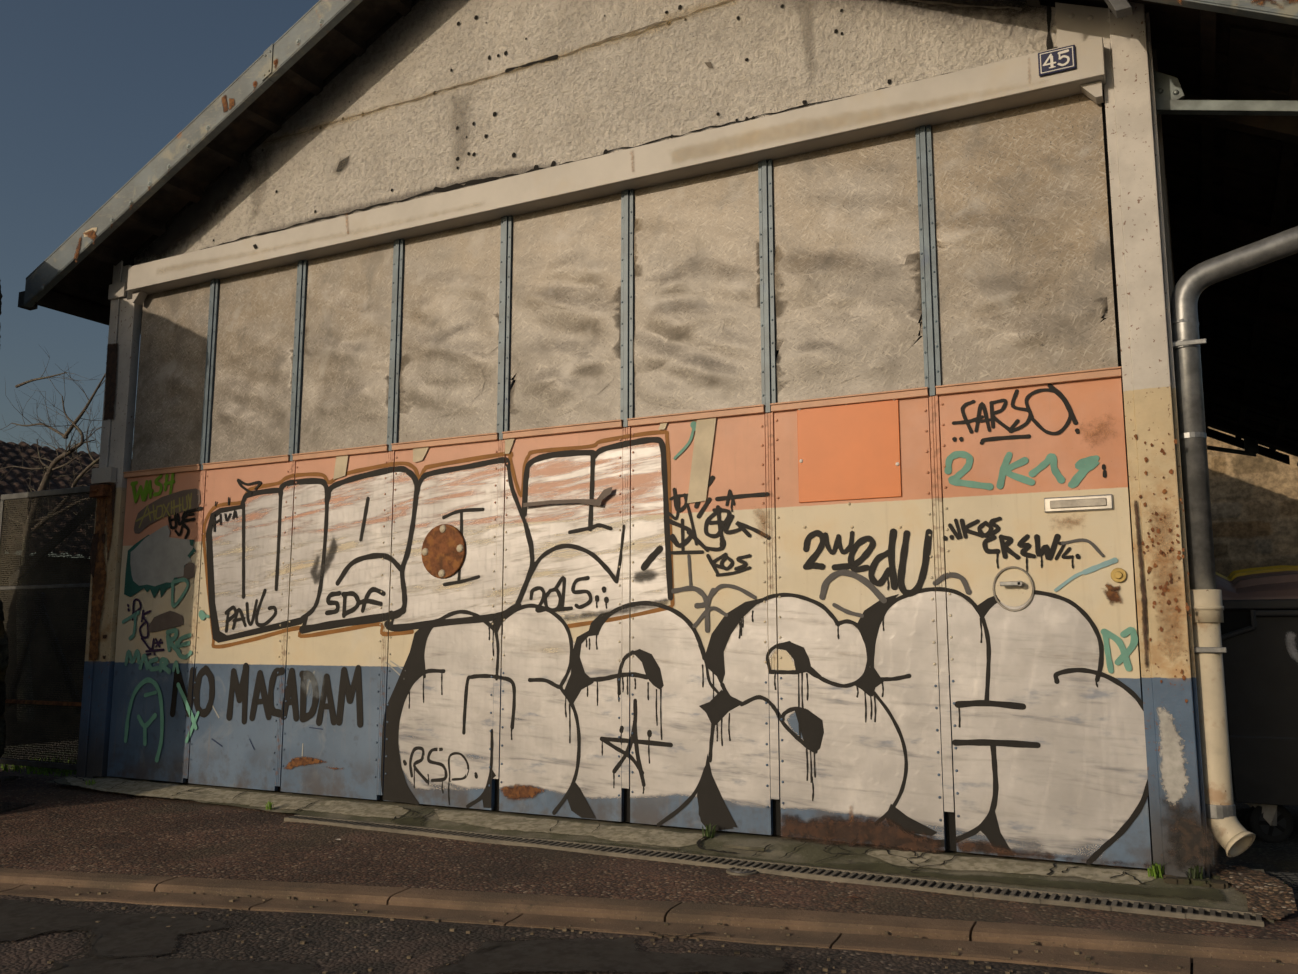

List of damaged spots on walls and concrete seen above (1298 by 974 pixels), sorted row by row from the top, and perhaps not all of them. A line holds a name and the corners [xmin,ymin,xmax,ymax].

crack [264,0,732,143]
crack [909,0,1058,57]
crack [200,72,952,250]
peeling [1139,469,1191,641]
peeling [1157,707,1189,805]